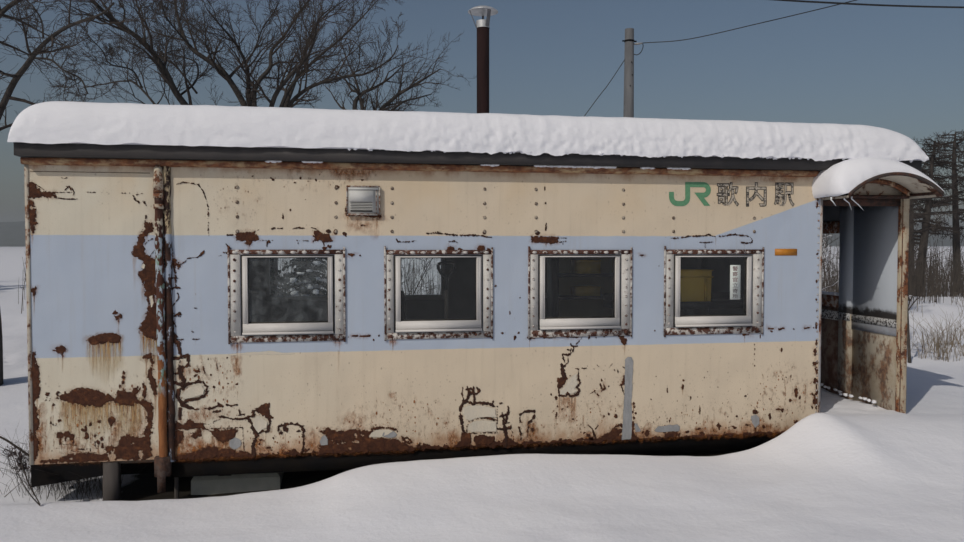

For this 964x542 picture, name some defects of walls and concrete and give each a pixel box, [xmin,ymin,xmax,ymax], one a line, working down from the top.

corrosion [29,182,76,233]
corrosion [220,229,273,256]
corrosion [311,227,347,250]
corrosion [531,223,566,244]
corrosion [32,222,174,464]
corrosion [167,299,819,462]